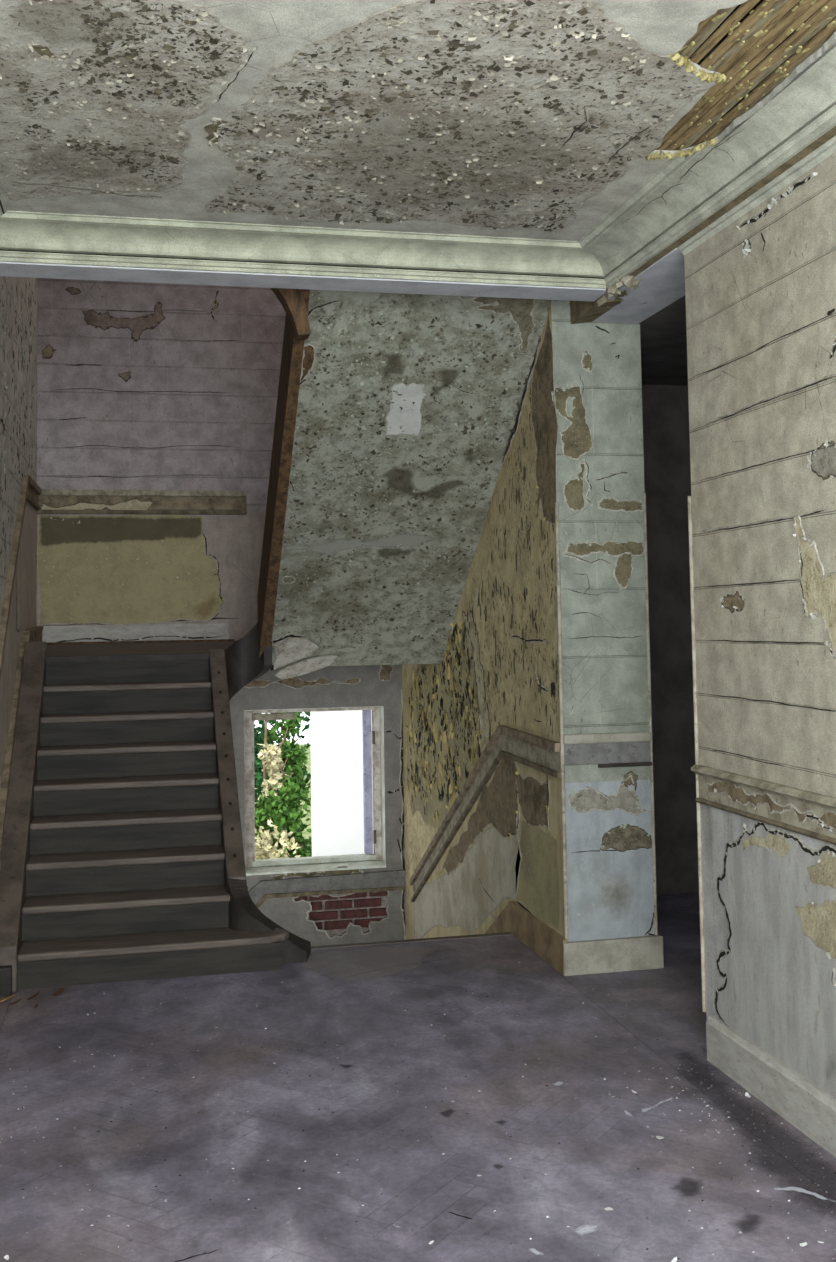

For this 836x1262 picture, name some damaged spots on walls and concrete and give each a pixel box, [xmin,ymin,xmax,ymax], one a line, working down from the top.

peeling [0,0,836,234]
peeling [82,302,165,342]
flaking render [807,439,836,480]
peeling [37,499,224,625]
peeling [272,296,645,830]
flaking render [720,591,745,613]
flaking render [270,866,364,880]
peeling [413,757,559,939]
peeling [568,771,652,852]
crack [804,813,835,831]
flaking render [293,891,389,939]
peeling [706,780,836,1099]